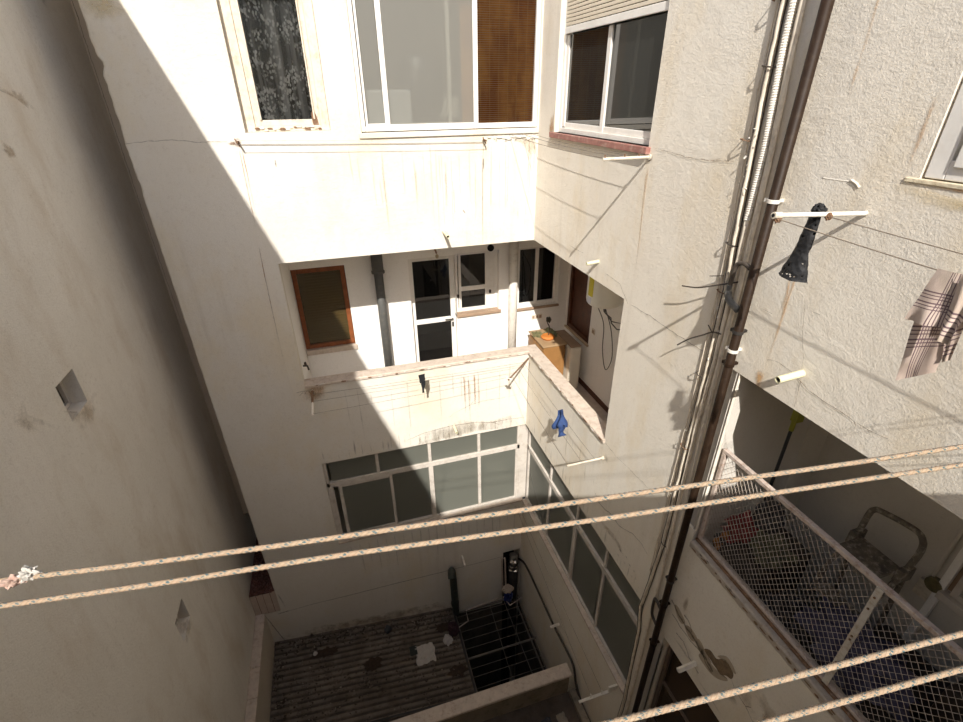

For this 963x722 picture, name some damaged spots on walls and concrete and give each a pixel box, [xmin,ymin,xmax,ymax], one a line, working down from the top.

peeling [692,548,835,715]